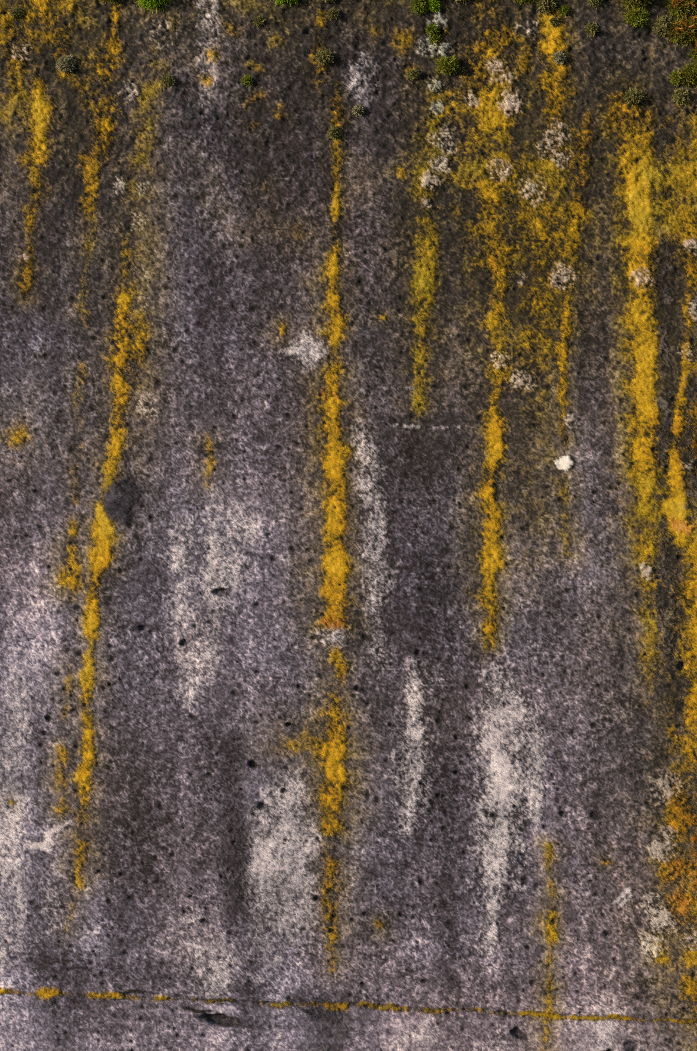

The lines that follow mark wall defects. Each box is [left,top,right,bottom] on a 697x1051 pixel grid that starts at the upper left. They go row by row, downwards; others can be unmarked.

damp [0,670,28,970]
crack [0,988,60,999]
damp [54,289,150,819]
damp [171,510,258,707]
damp [186,695,347,996]
crack [87,989,452,1015]
damp [289,245,386,677]
damp [396,660,425,833]
damp [478,251,508,647]
damp [474,668,547,955]
crack [520,1011,697,1024]
damp [608,93,697,679]